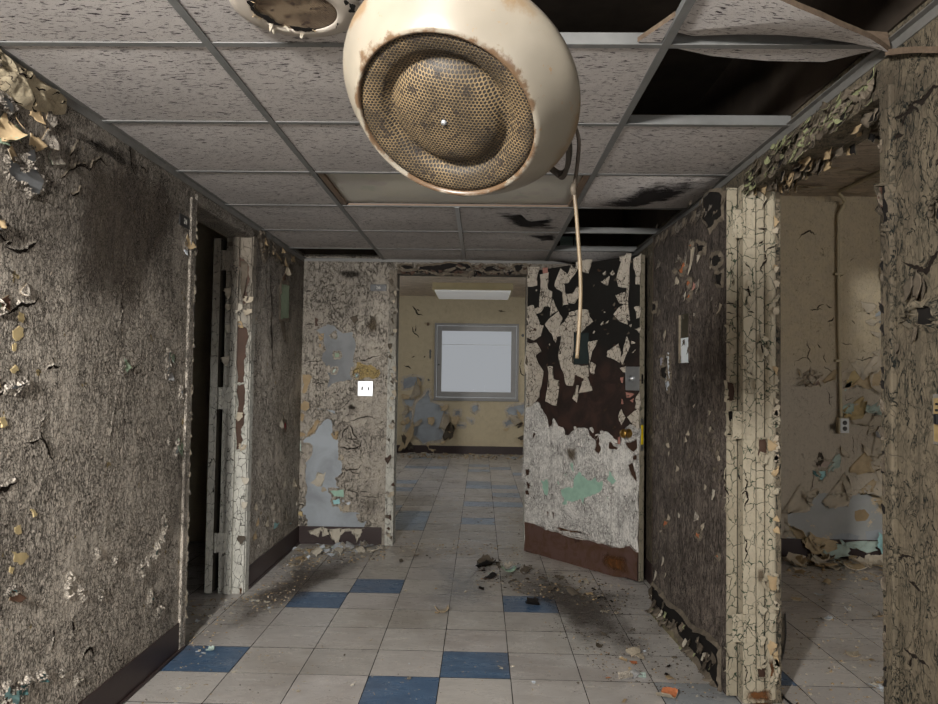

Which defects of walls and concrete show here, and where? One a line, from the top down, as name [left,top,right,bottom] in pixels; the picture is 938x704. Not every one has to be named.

peeling [0,90,66,199]
peeling [741,64,882,196]
crack [0,233,36,254]
crack [6,295,39,315]
peeling [221,230,296,452]
peeling [350,188,770,552]
crack [0,477,19,493]
peeling [237,372,370,553]
peeling [773,349,886,591]
peeling [0,668,84,704]
peeling [644,552,722,692]
peeling [754,572,780,687]